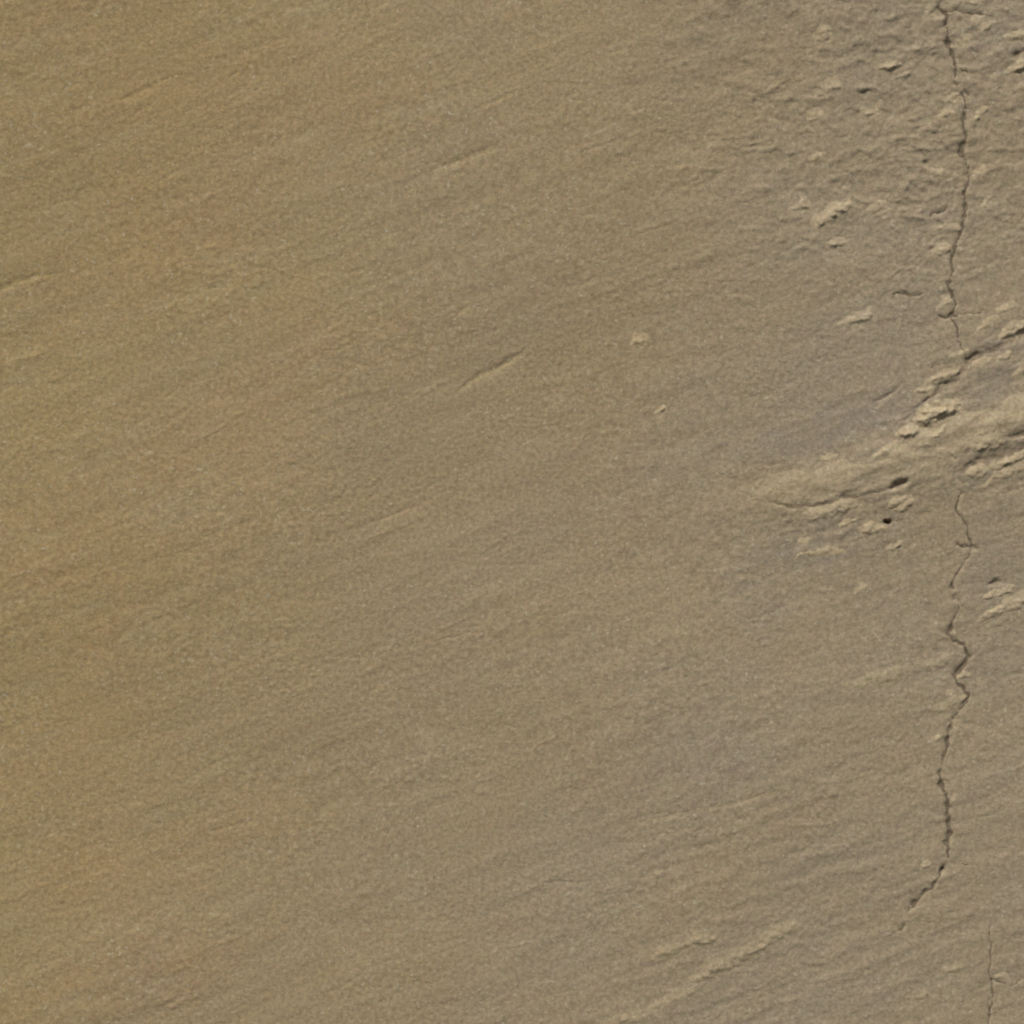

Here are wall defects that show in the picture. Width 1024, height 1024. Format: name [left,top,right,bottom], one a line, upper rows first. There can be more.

crack [892,3,1024,401]
crack [954,497,973,548]
crack [891,583,972,936]